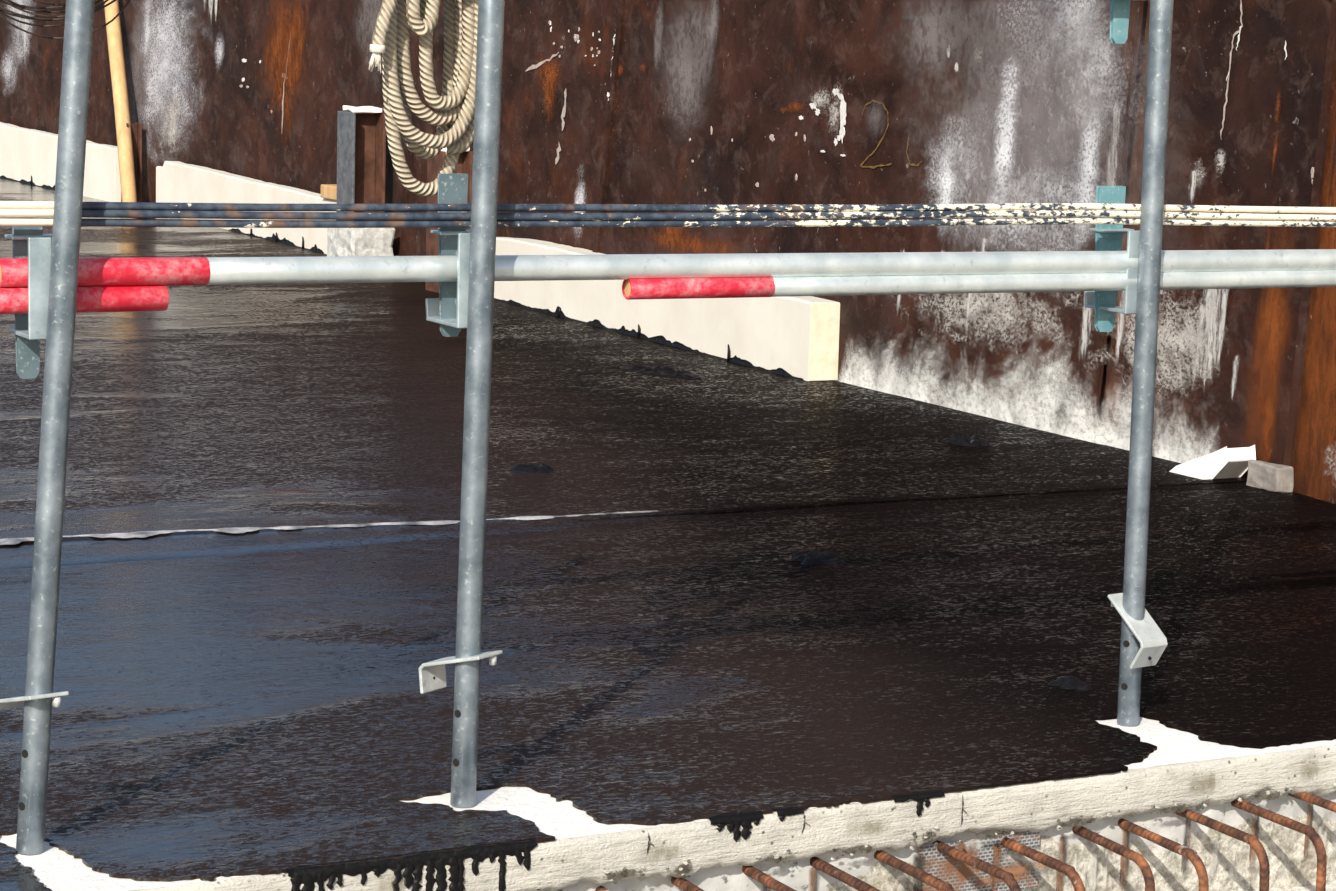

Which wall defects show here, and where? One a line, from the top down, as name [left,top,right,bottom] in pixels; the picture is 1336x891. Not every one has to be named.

corrosion [267,8,303,122]
damp [1107,103,1120,186]
corrosion [1318,87,1336,249]
damp [1081,298,1091,353]
damp [1116,291,1124,357]
damp [1169,289,1238,396]
corrosion [1296,287,1336,502]
corrosion [810,866,818,891]
corrosion [977,835,1066,891]
corrosion [1120,830,1130,887]
corrosion [1249,815,1259,861]
corrosion [1304,803,1313,855]